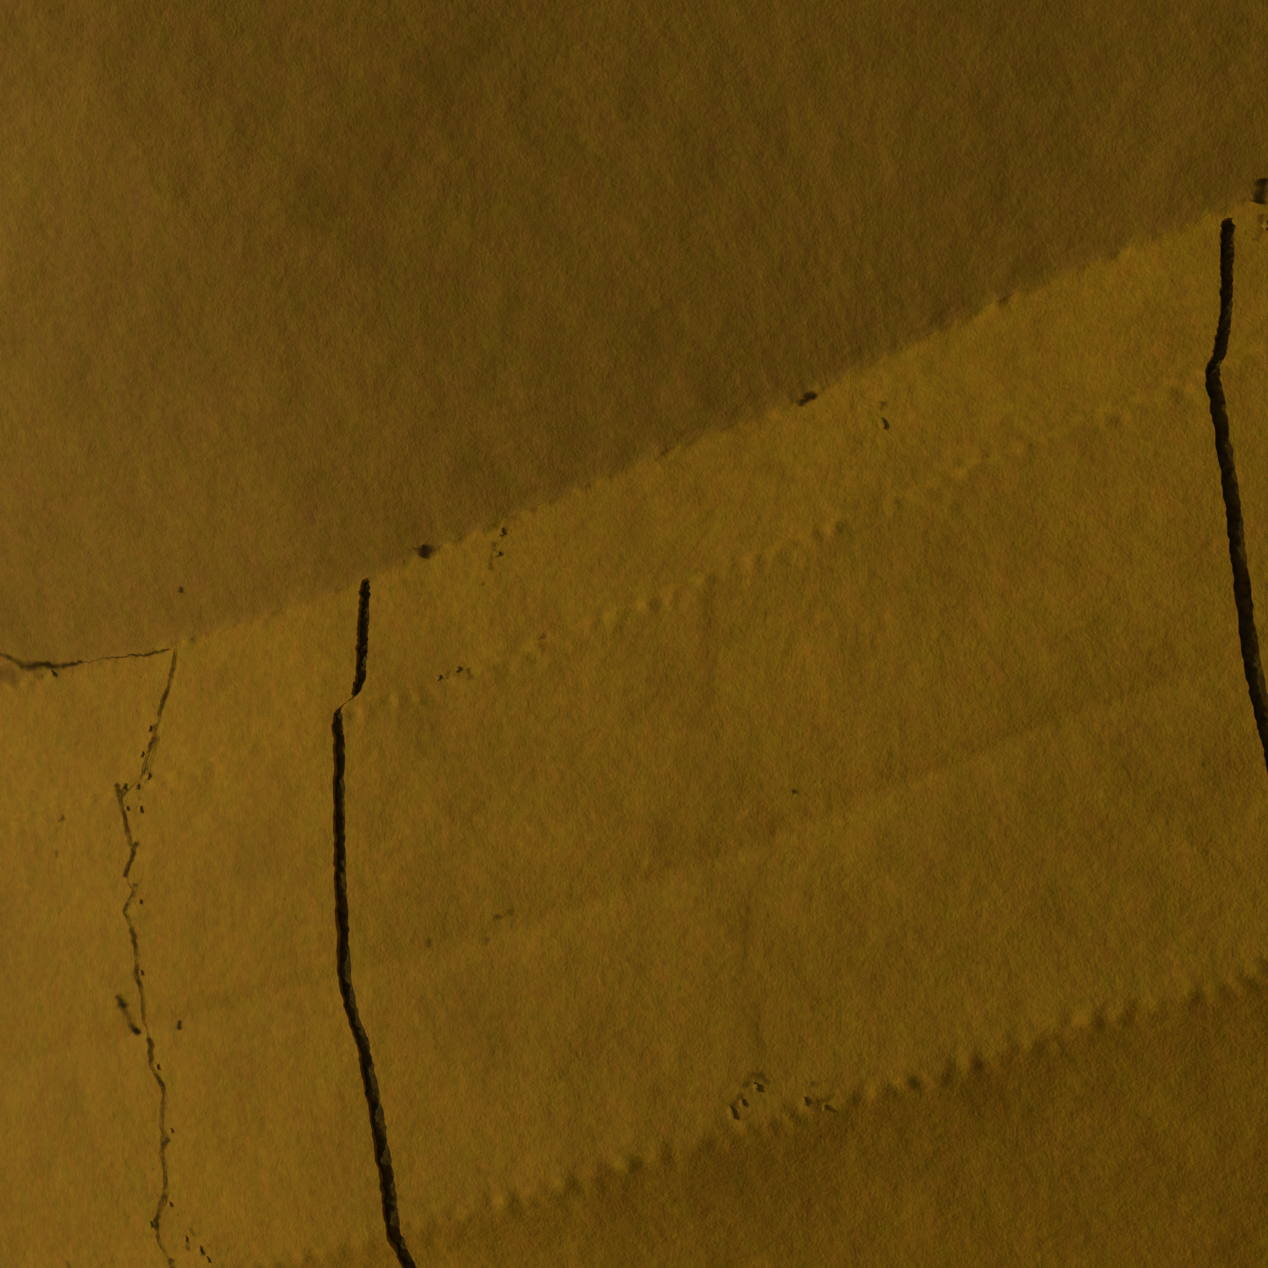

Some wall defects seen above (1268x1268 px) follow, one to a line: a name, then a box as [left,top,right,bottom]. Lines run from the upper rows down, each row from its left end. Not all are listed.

crack [0,649,175,1263]